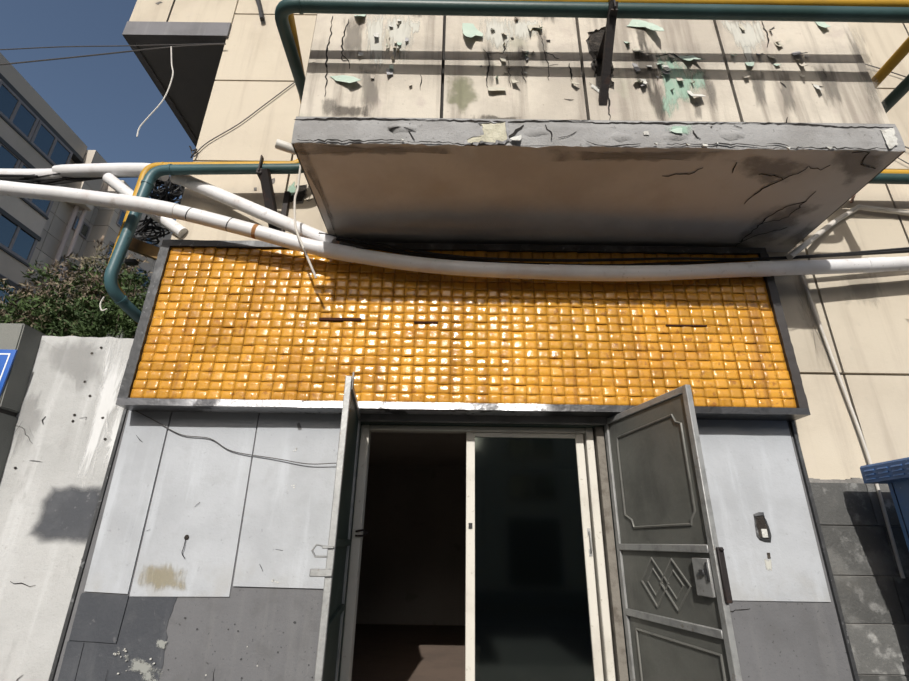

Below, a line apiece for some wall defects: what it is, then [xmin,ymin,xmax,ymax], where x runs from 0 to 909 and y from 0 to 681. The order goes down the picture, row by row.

peeling [330,14,420,83]
peeling [462,17,543,91]
crack [294,16,893,204]
peeling [627,19,664,31]
peeling [623,41,706,134]
peeling [722,20,824,91]
crack [735,192,815,247]